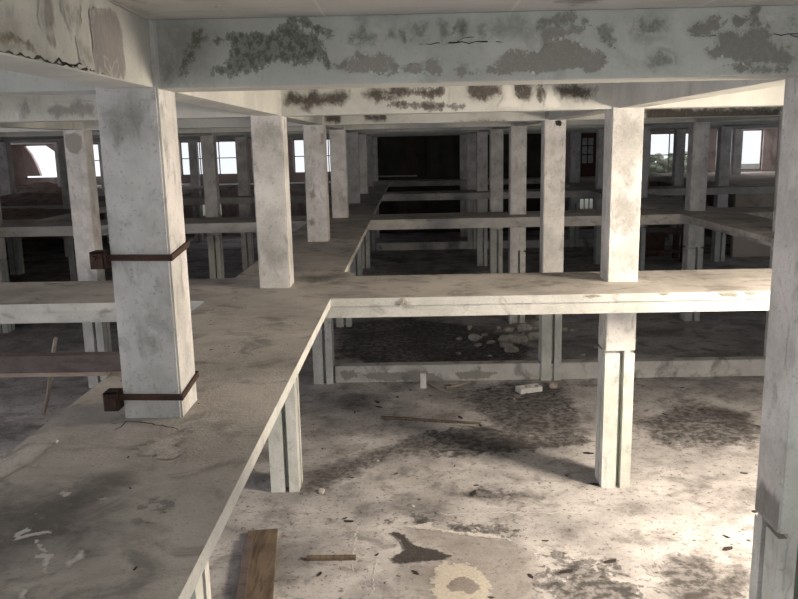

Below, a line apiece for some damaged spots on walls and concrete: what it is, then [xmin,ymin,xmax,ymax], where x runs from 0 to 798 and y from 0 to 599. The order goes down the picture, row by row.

crack [0,50,103,74]
water stain [0,0,126,80]
water stain [156,17,335,88]
peeling [332,26,609,79]
water stain [345,0,617,51]
water stain [627,9,680,76]
peeling [687,6,798,74]
water stain [281,83,600,125]
water stain [251,116,282,153]
water stain [334,317,538,363]
water stain [299,378,597,497]
water stain [632,397,762,457]